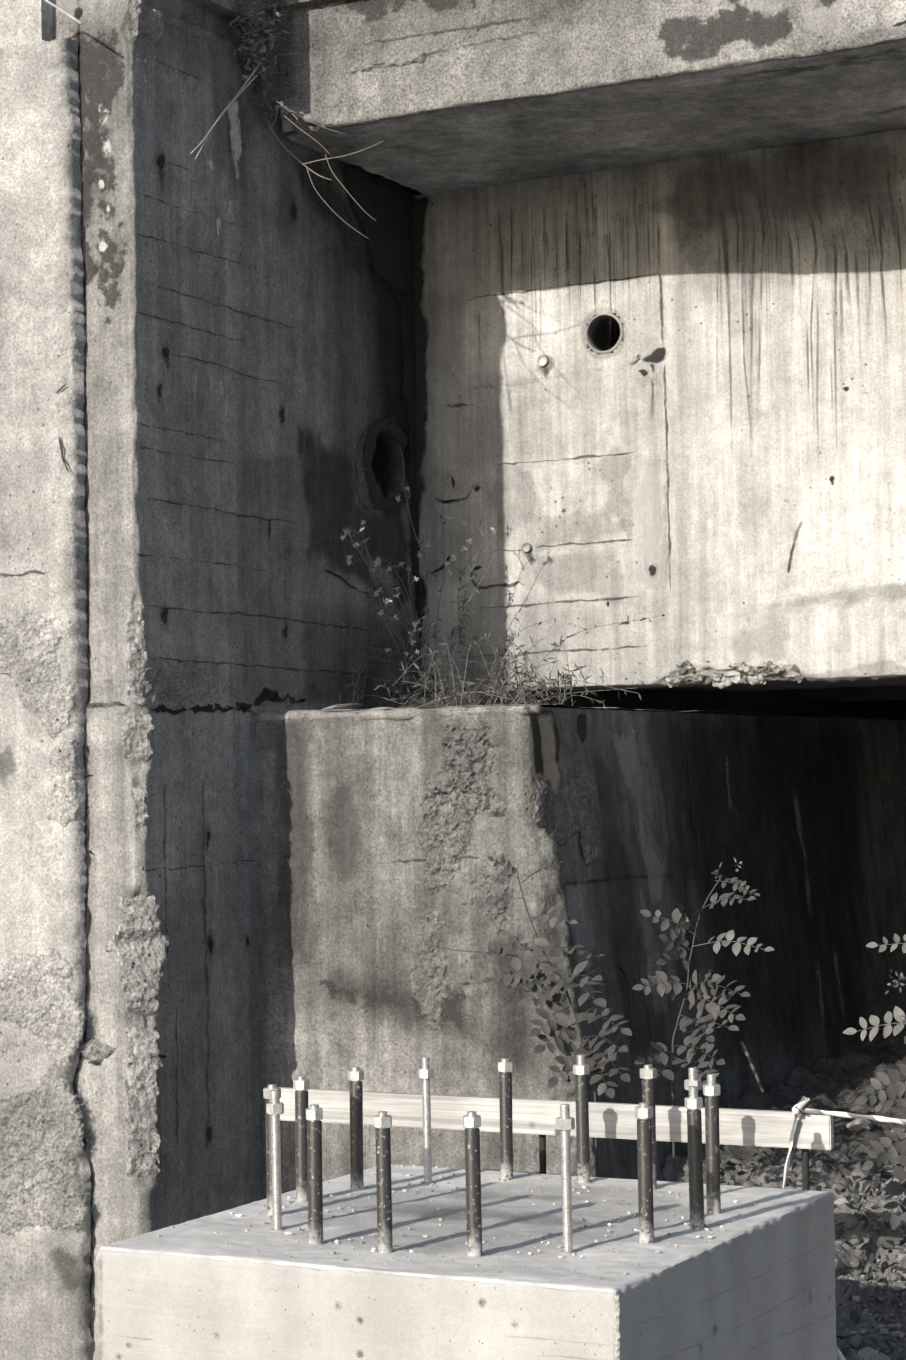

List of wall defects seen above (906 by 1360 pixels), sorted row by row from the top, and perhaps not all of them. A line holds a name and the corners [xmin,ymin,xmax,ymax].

damp [69,27,147,323]
damp [228,102,242,177]
spalling [86,598,306,764]
spalling [131,785,149,828]
spalling [78,893,170,1180]